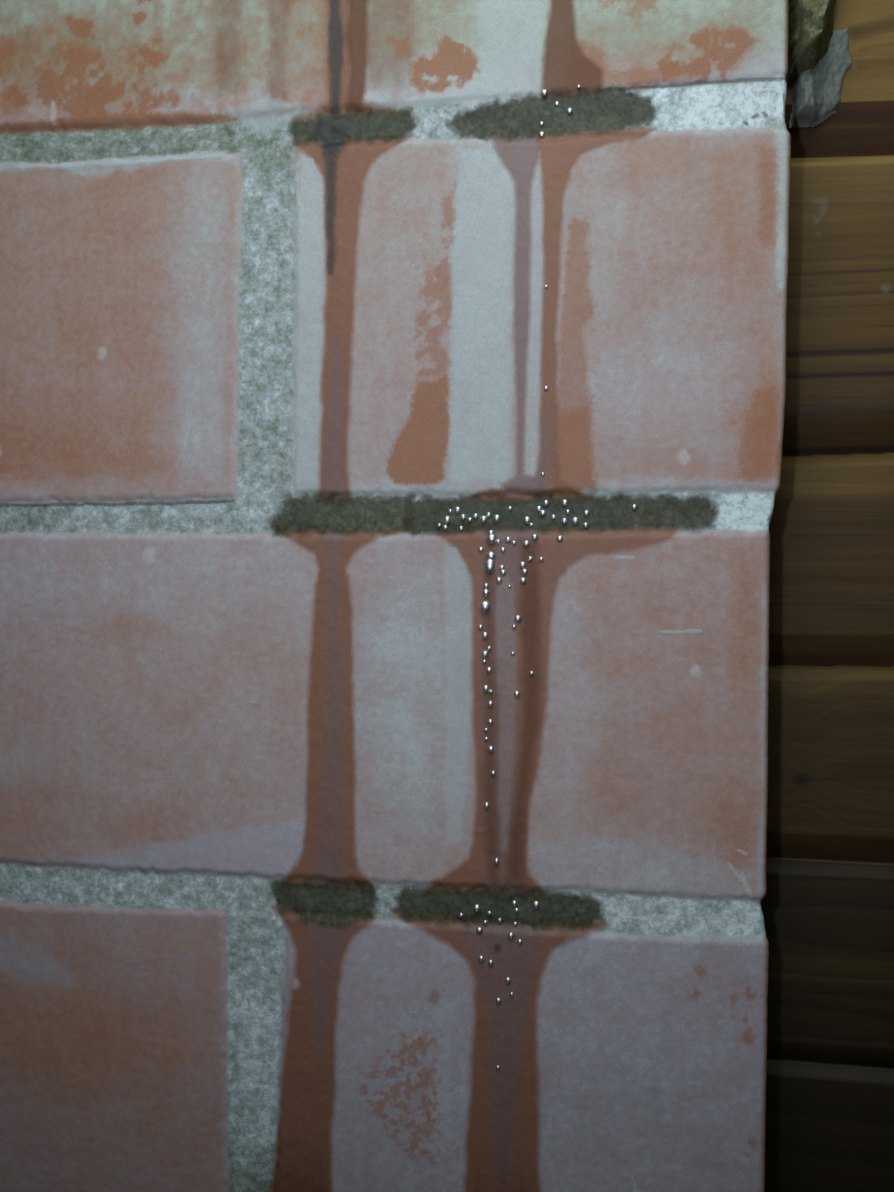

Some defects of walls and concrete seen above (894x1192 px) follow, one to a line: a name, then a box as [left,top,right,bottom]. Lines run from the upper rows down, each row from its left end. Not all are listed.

damp [74,0,719,1192]